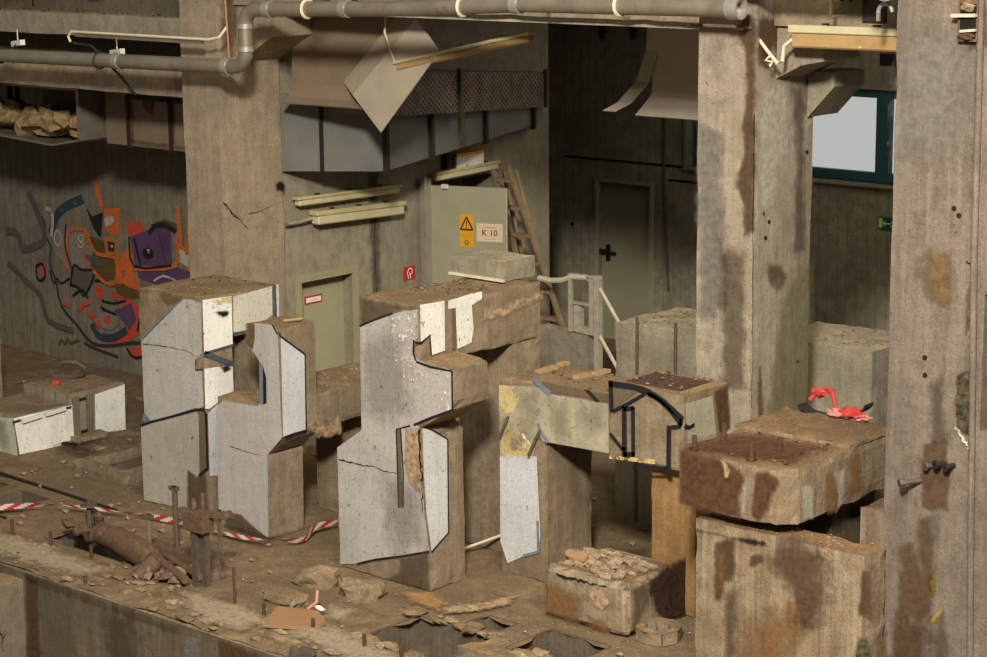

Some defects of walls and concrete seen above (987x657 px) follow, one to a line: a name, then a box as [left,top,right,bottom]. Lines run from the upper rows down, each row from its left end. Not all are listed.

damp [737,18,787,233]
damp [700,128,725,315]
rust [769,266,785,287]
rust [626,372,824,519]
damp [716,538,765,599]
damp [880,442,949,657]